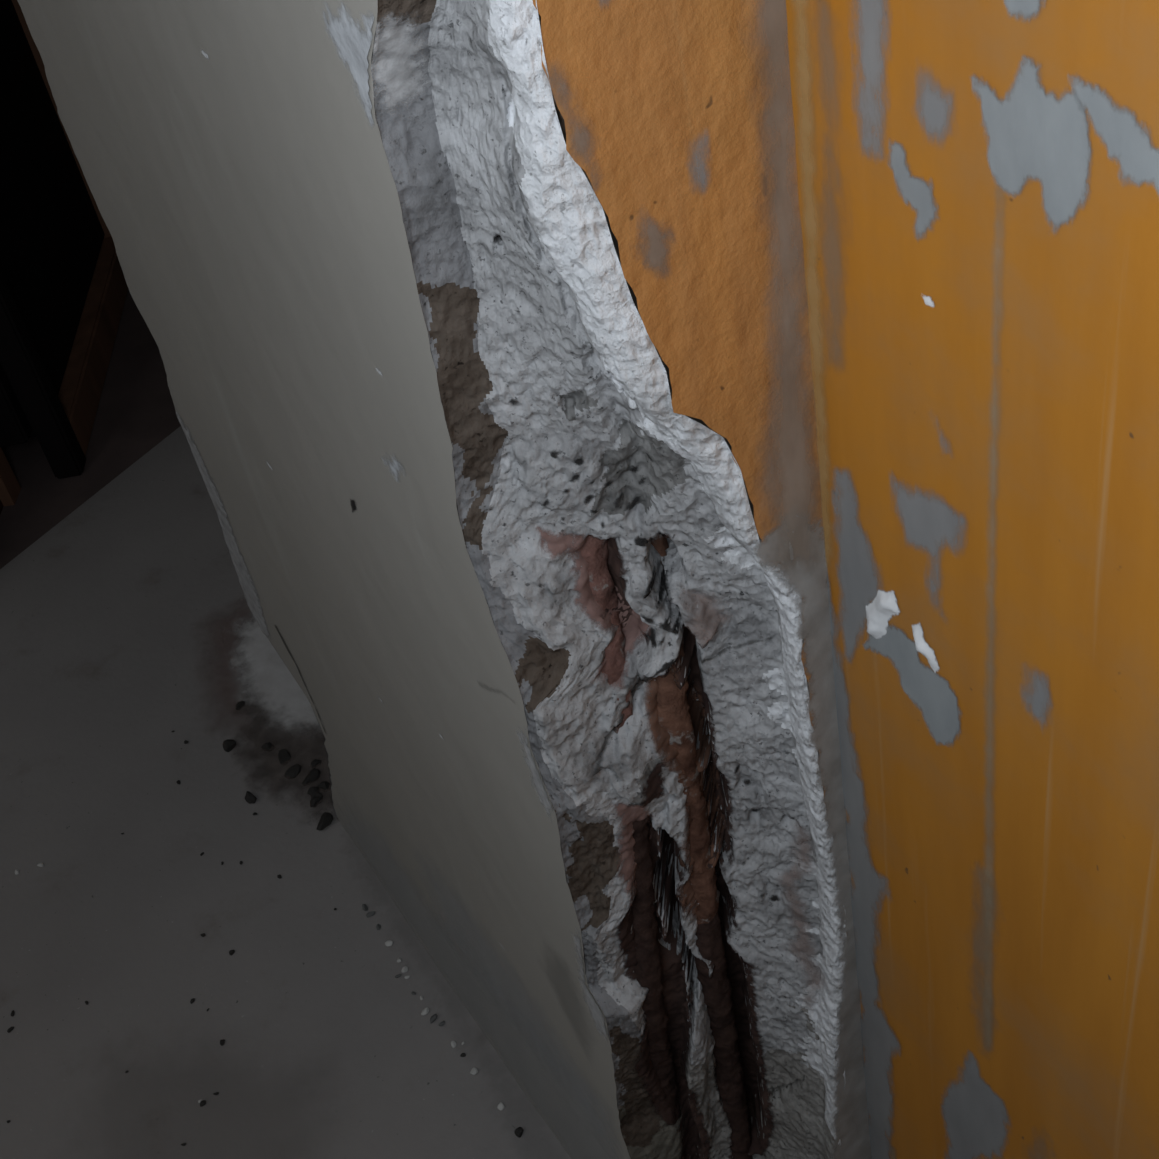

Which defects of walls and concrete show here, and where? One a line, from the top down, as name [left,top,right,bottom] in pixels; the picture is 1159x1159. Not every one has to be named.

peeling [1004,0,1040,19]
peeling [972,57,1159,231]
corrosion [536,527,649,687]
spalling [324,0,965,1159]
corrosion [614,624,774,1159]
peeling [942,1053,1008,1159]